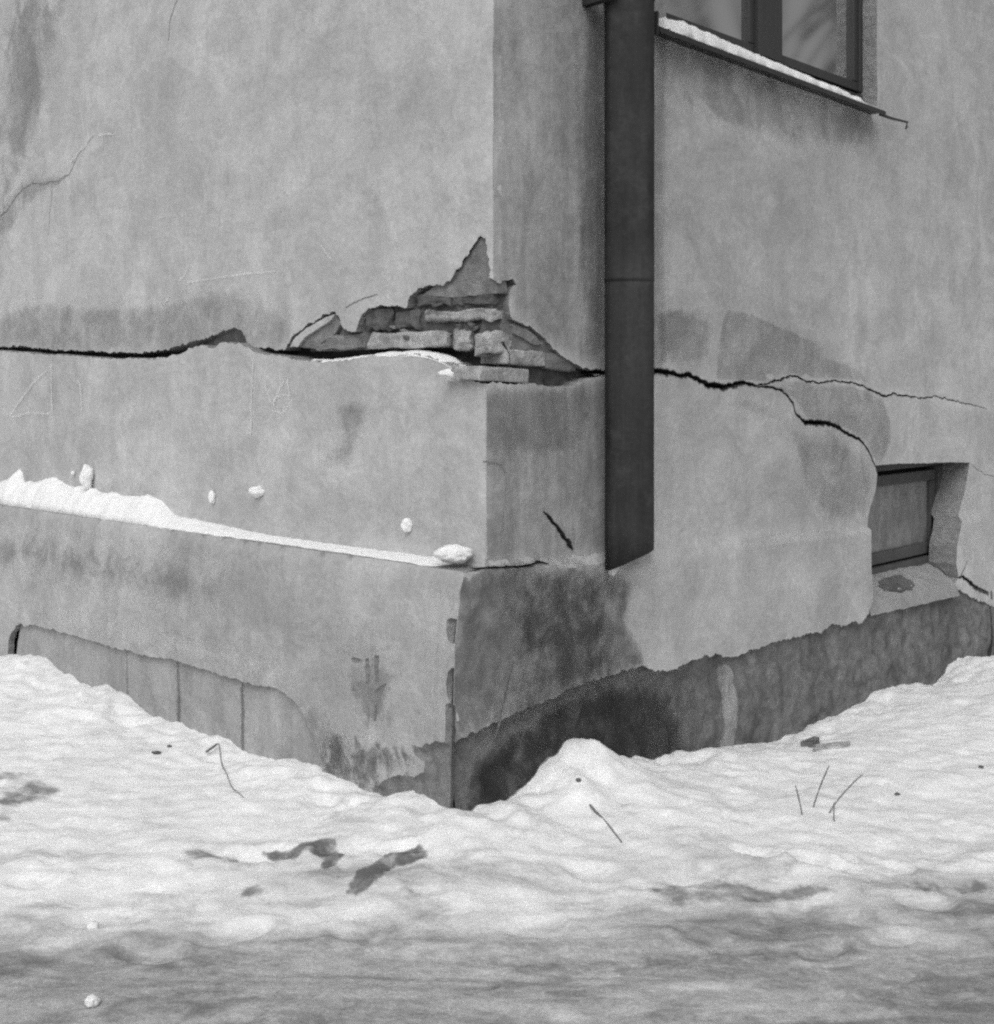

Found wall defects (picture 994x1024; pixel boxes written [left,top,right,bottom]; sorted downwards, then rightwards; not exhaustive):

crack [0,137,93,235]
crack [0,329,247,358]
crack [278,342,510,384]
flaking render [290,236,605,386]
crack [581,368,605,377]
crack [654,367,986,466]
crack [471,461,574,570]
leakage [454,568,678,811]